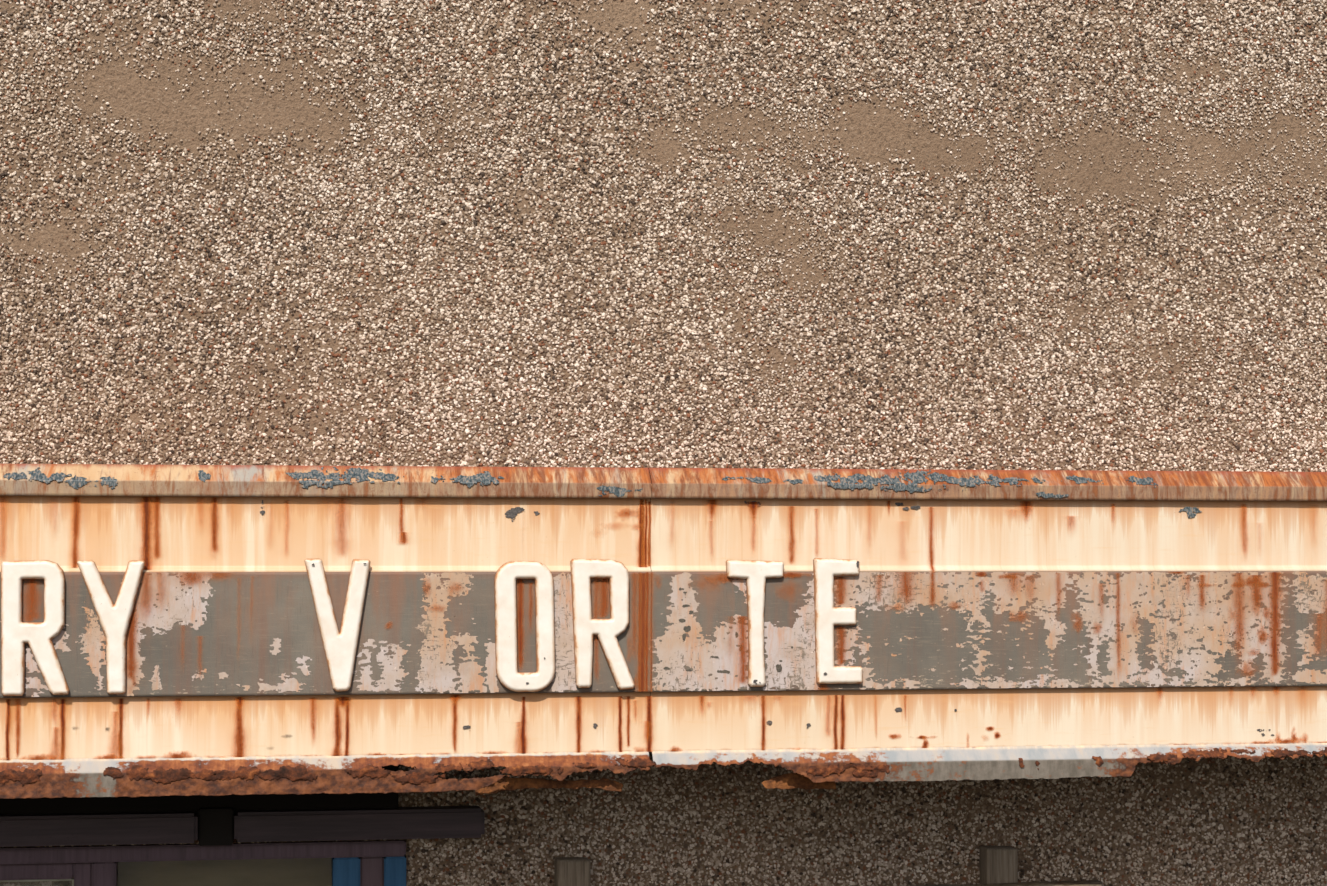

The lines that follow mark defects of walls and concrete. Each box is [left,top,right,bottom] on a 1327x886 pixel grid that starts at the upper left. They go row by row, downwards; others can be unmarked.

peeling [4,467,118,489]
peeling [722,470,1104,510]
rust [784,506,801,577]
peeling [52,573,216,696]
peeling [192,656,312,693]
peeling [353,572,499,693]
rust [837,577,845,604]
rust [837,626,845,665]
peeling [648,561,1327,691]
rust [0,699,65,786]
rust [806,685,890,777]
rust [1147,734,1327,762]